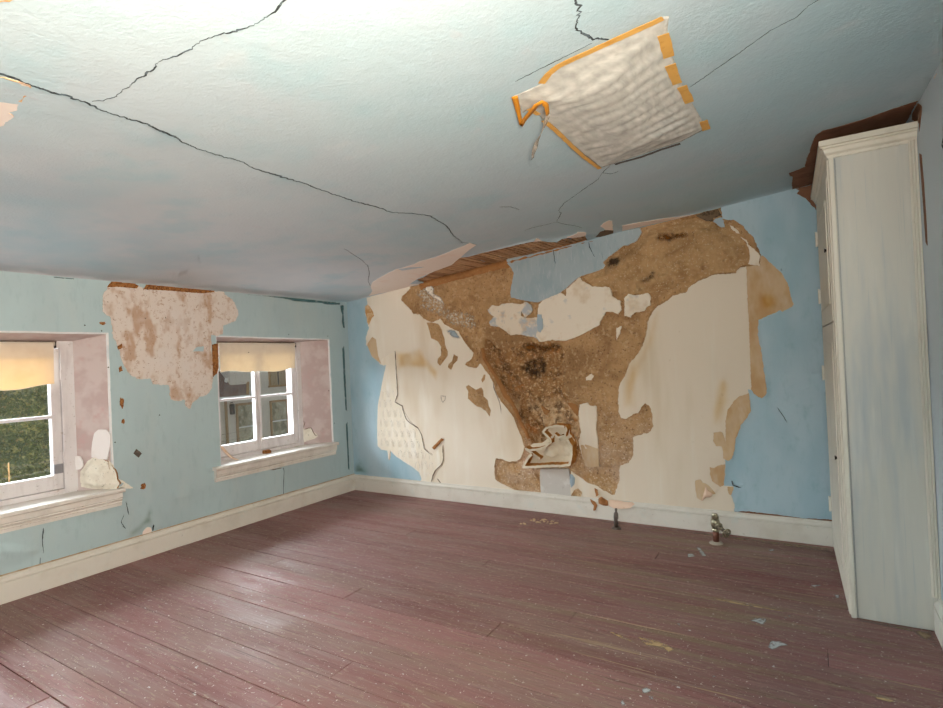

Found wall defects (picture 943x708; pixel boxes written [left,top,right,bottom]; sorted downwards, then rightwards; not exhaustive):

crack [574,0,609,41]
crack [692,0,818,86]
peeling [0,77,31,127]
crack [0,0,476,250]
flaking render [912,103,922,131]
peeling [99,282,238,409]
spalling [369,208,761,511]